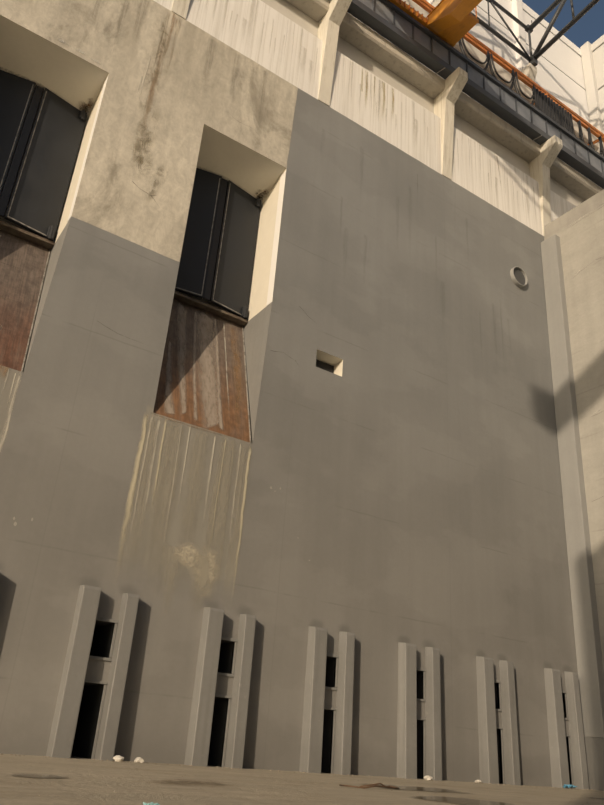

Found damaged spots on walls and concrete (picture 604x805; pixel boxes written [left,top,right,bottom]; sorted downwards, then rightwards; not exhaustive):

leakage [123,303,228,530]
leakage [206,437,251,555]